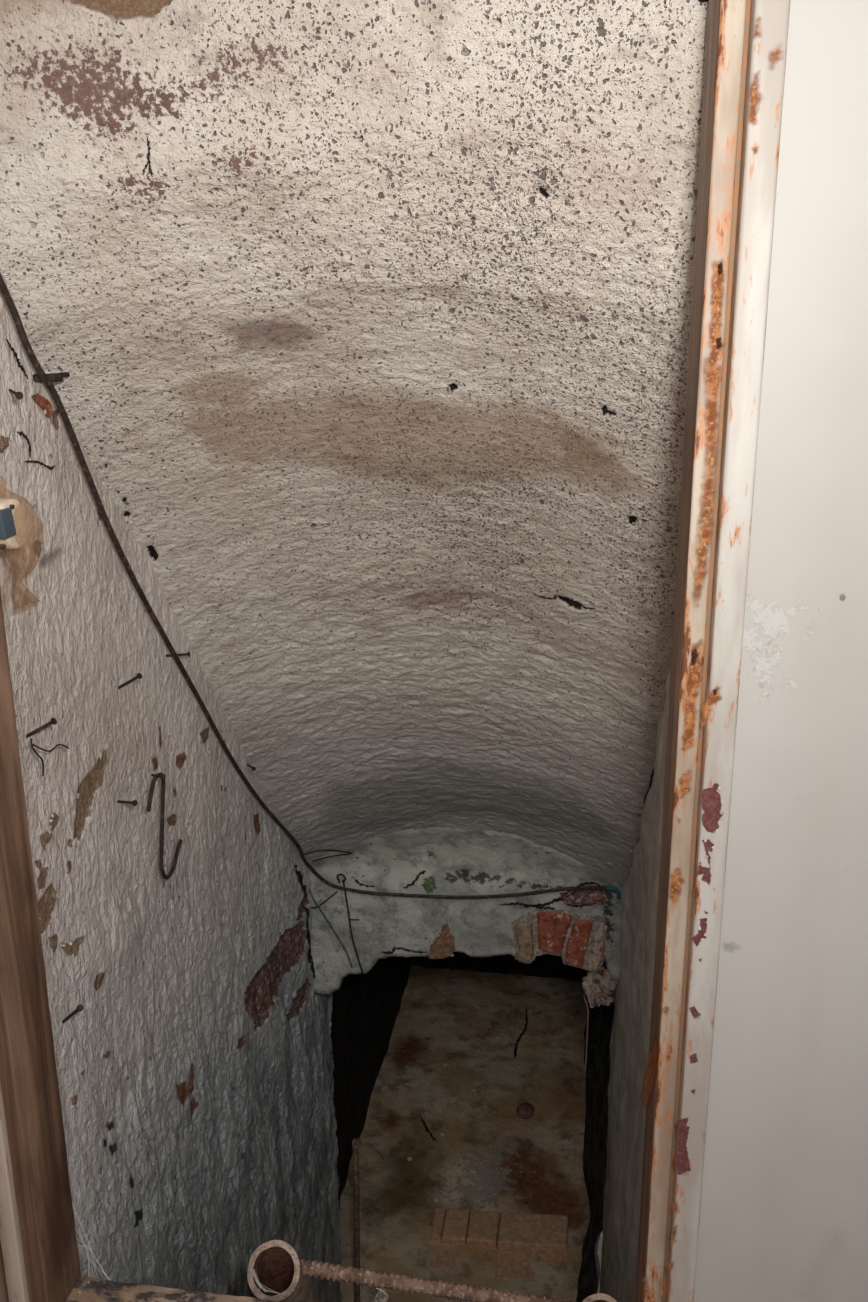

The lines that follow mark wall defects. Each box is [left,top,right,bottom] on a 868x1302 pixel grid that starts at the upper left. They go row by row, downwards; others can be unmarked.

peeling [3,0,289,155]
peeling [106,170,179,206]
corrosion [694,262,724,600]
corrosion [683,643,721,749]
spalling [67,749,108,874]
corrosion [680,772,690,796]
spalling [35,812,86,959]
spalling [238,890,310,1049]
flaking render [511,885,608,973]
corrosion [671,870,683,901]
water stain [382,1130,536,1214]
corrosion [498,1144,588,1227]